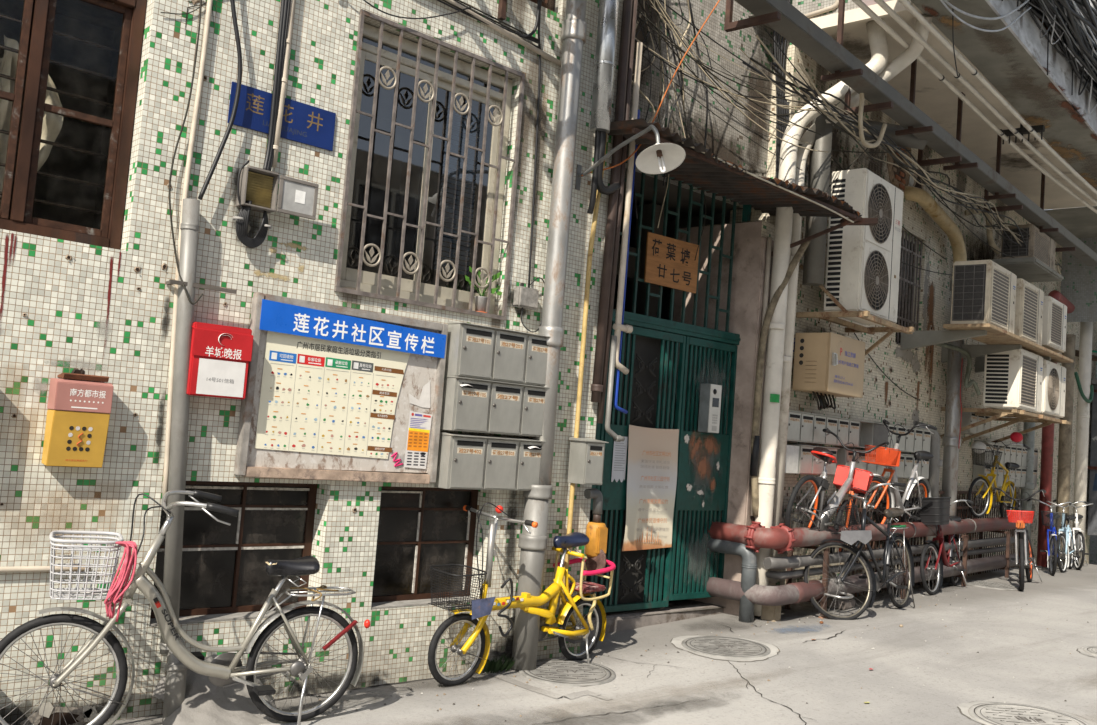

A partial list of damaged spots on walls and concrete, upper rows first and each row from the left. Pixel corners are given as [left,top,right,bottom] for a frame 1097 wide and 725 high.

corrosion [0,233,17,320]
corrosion [105,252,121,345]
water stain [0,703,39,725]
water stain [269,673,379,696]
crack [612,624,845,725]